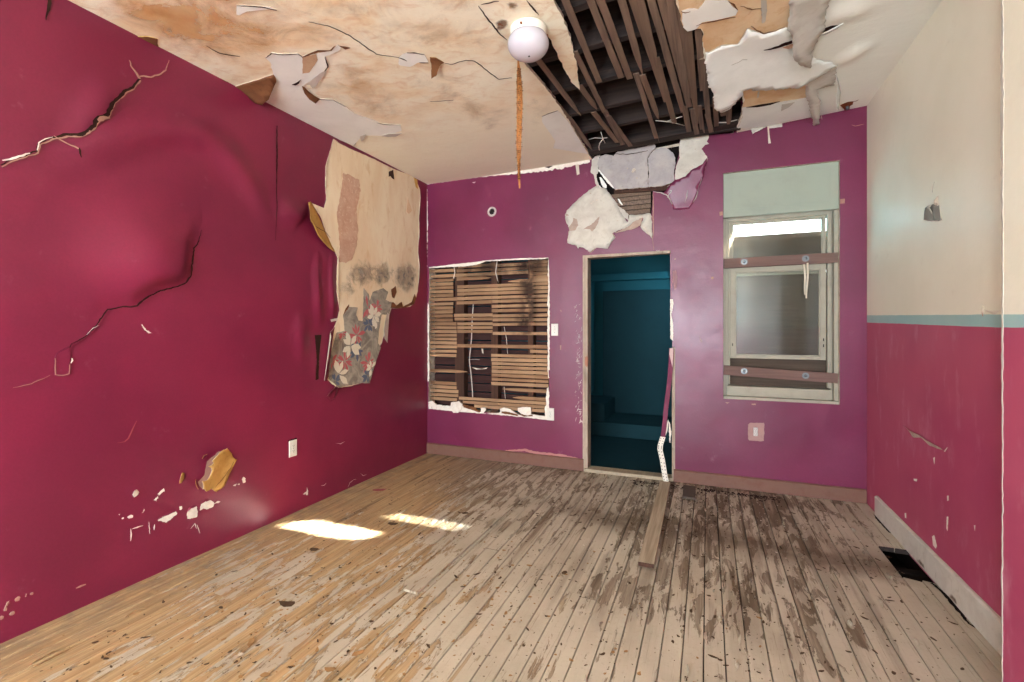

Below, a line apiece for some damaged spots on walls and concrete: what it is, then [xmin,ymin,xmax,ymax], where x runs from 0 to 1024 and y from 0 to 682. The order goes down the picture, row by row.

peeling [236,4,277,15]
crack [310,22,399,58]
flaking render [678,0,790,52]
crack [445,60,508,80]
crack [1,60,169,167]
peeling [738,66,837,134]
hole [924,184,942,222]
spalling [235,44,709,420]
crack [70,230,203,348]
peeling [119,499,220,541]